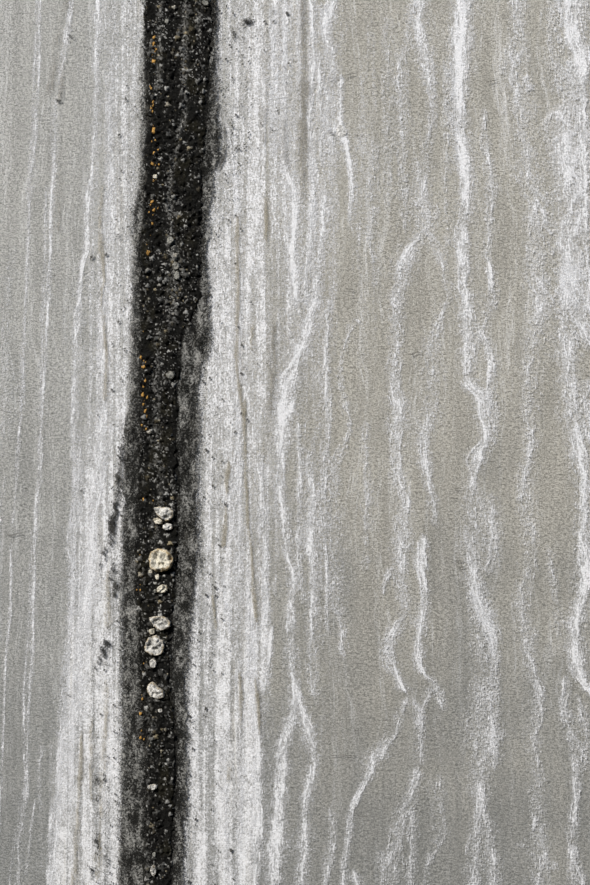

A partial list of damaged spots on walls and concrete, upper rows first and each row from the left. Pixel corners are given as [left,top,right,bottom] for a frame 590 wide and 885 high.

leakage [0,549,13,771]
leakage [0,186,34,451]
leakage [9,0,74,885]
leakage [38,0,503,885]
leakage [499,0,590,885]